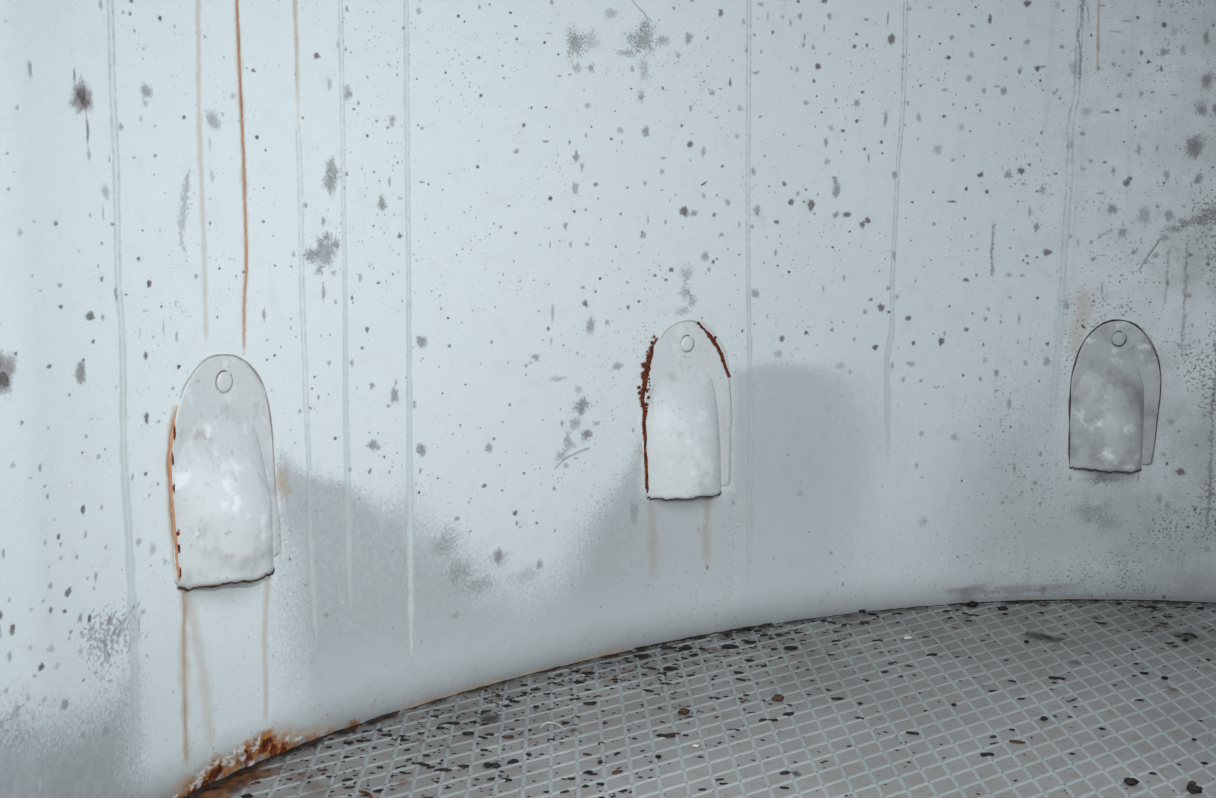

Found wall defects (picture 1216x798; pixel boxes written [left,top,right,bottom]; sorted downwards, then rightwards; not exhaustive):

rust [236,0,247,275]
rust [637,335,658,493]
rust [697,322,731,377]
rust [168,406,186,664]
rust [179,730,289,798]